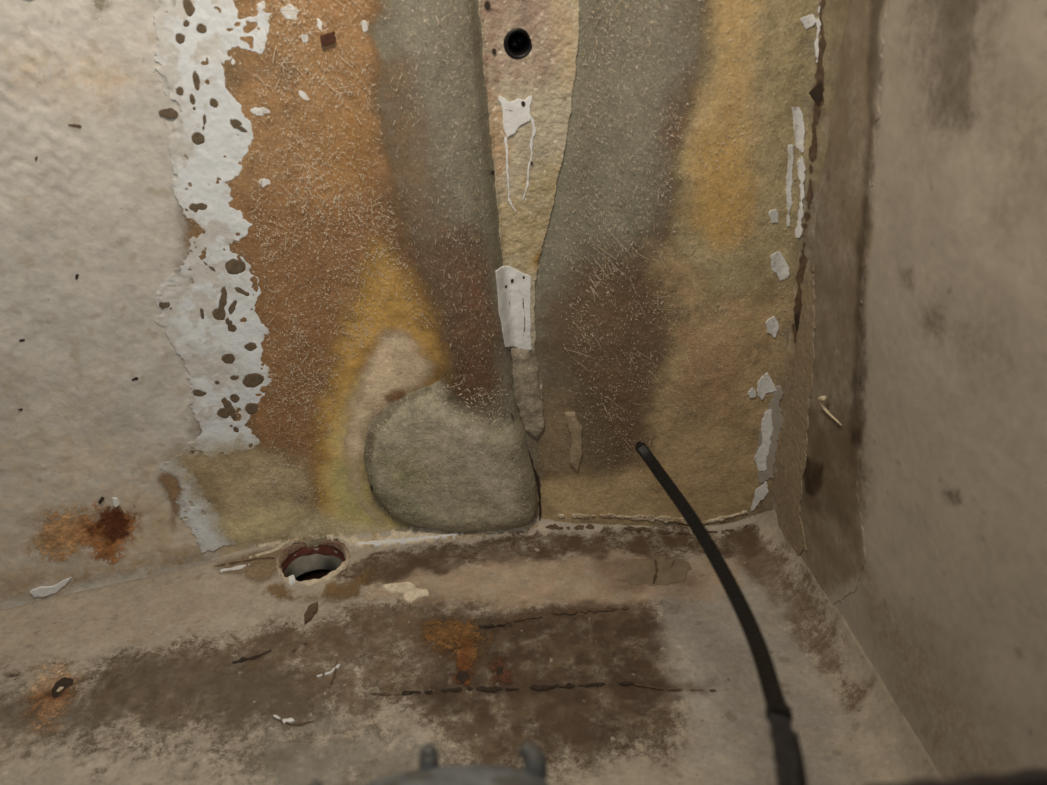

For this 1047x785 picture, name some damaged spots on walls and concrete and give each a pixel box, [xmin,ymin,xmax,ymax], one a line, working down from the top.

damp [176,0,499,600]
peeling [153,0,821,556]
damp [511,0,830,526]
crack [792,0,826,345]
rust [23,662,81,732]
rust [28,497,138,564]
rust [421,618,492,685]
peeling [622,558,691,586]